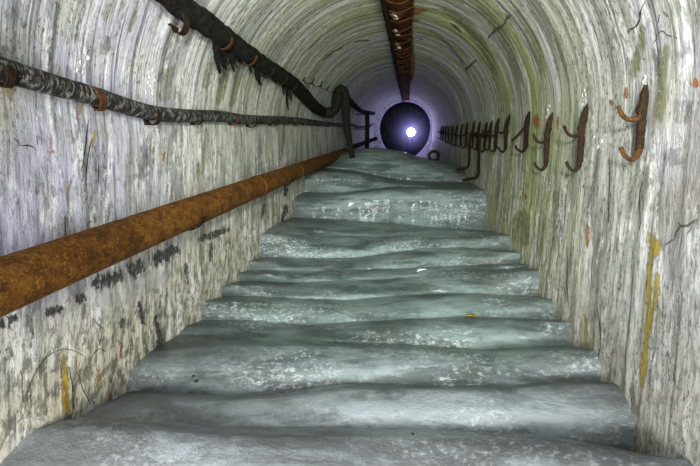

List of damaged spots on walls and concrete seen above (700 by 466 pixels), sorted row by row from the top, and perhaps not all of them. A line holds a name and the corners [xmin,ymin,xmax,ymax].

crack [627,2,678,42]
crack [666,220,696,246]
water stain [640,233,661,386]
water stain [62,354,70,413]